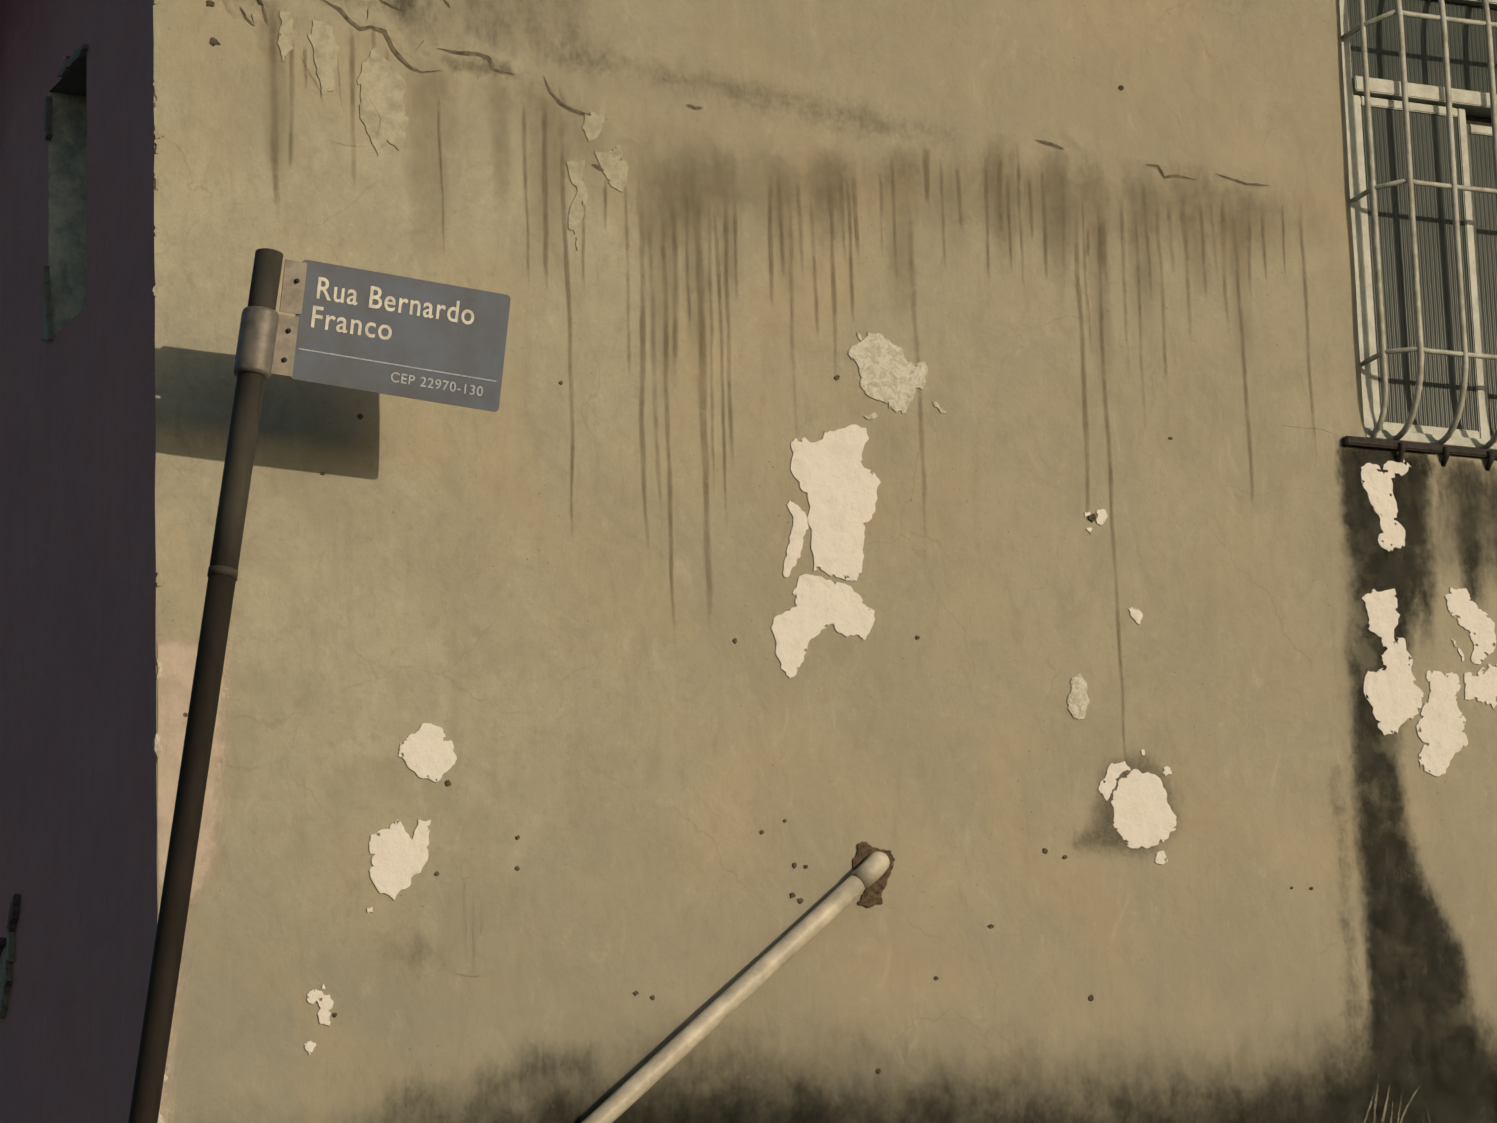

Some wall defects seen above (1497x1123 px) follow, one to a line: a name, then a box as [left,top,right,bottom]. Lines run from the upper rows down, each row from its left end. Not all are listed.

peeling [206,0,340,96]
crack [323,0,609,120]
peeling [771,332,946,679]
peeling [1360,459,1411,552]
peeling [1361,587,1497,776]
peeling [397,723,457,786]
peeling [1089,749,1177,865]
damp [1110,447,1497,1123]
peeling [366,819,439,913]
peeling [307,984,338,1026]
damp [537,1093,608,1123]
damp [613,1078,1090,1123]